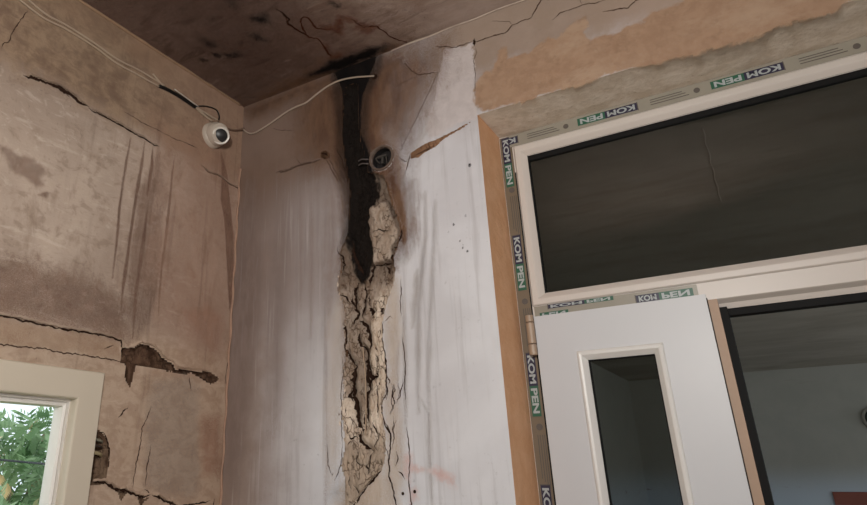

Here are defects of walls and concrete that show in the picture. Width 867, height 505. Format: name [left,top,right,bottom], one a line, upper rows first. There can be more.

crack [23,72,238,188]
leakage [82,0,441,104]
crack [275,8,331,56]
crack [436,0,637,76]
peeling [411,0,853,159]
crack [0,312,125,362]
leakage [0,108,458,505]
flaking render [337,84,403,505]
crack [93,408,215,505]